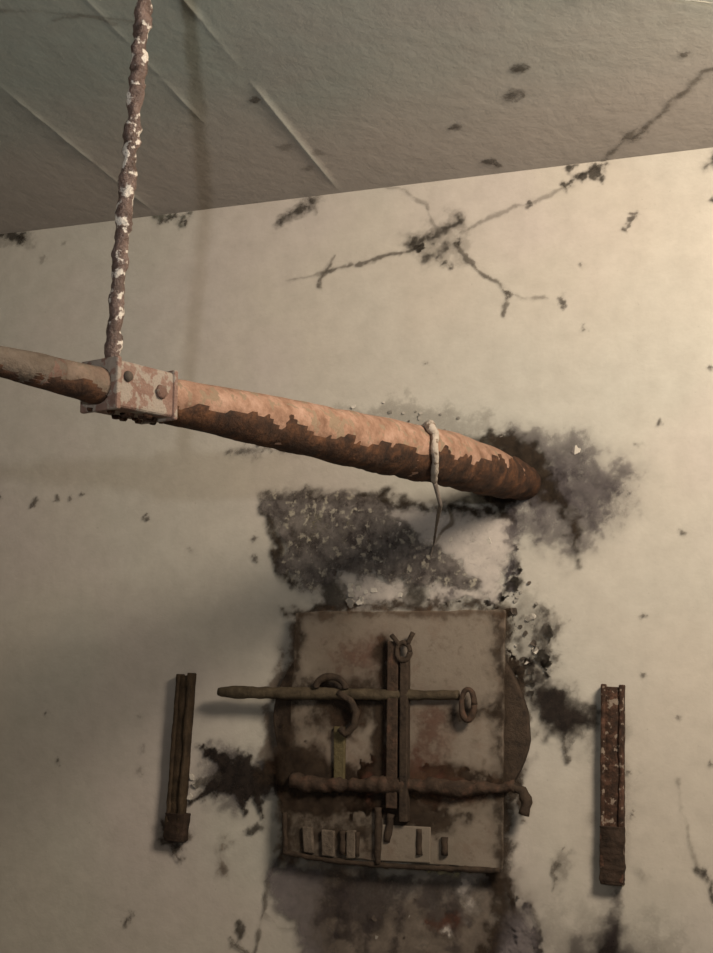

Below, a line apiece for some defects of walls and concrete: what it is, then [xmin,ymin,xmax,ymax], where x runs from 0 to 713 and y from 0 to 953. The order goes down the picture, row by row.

crack [561,68,713,188]
crack [317,216,511,316]
damp [542,465,595,561]
spalling [260,486,560,684]
damp [530,666,597,763]
corrosion [158,820,191,861]
damp [267,862,513,953]